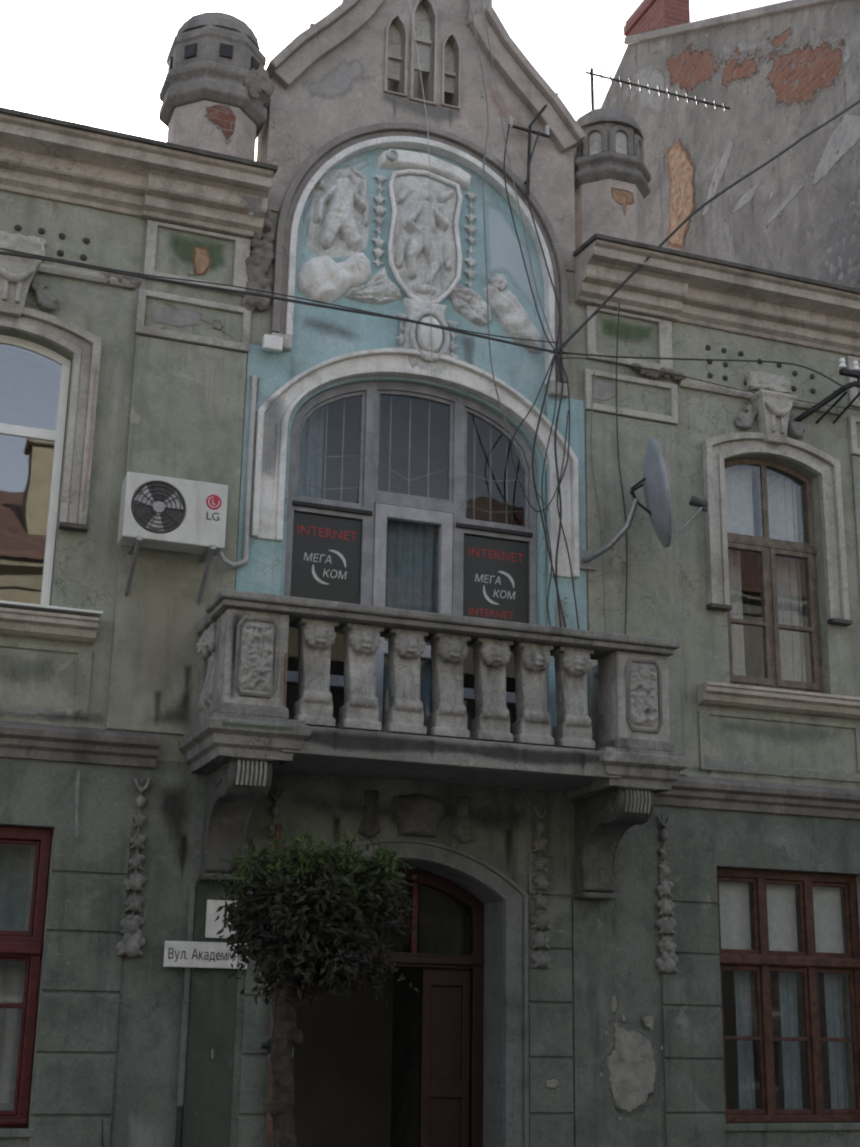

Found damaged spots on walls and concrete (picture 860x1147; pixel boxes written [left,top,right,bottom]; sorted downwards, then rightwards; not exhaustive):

flaking render [204,104,236,144]
flaking render [633,27,850,127]
flaking render [662,139,699,249]
spalling [189,240,214,275]
spalling [599,995,664,1120]